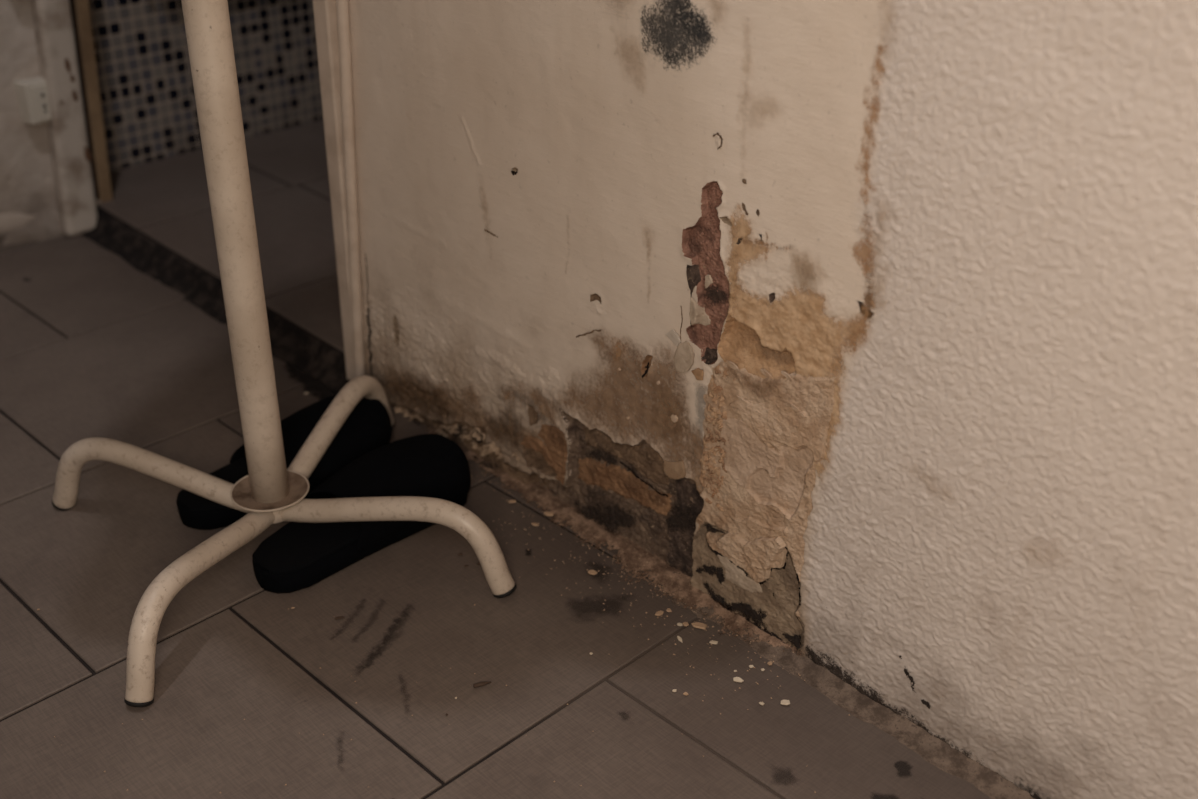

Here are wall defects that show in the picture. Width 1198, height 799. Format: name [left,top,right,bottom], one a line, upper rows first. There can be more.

damp [641,0,712,68]
damp [381,336,689,462]
flaking render [387,181,842,651]
damp [805,645,982,765]
damp [895,761,911,776]